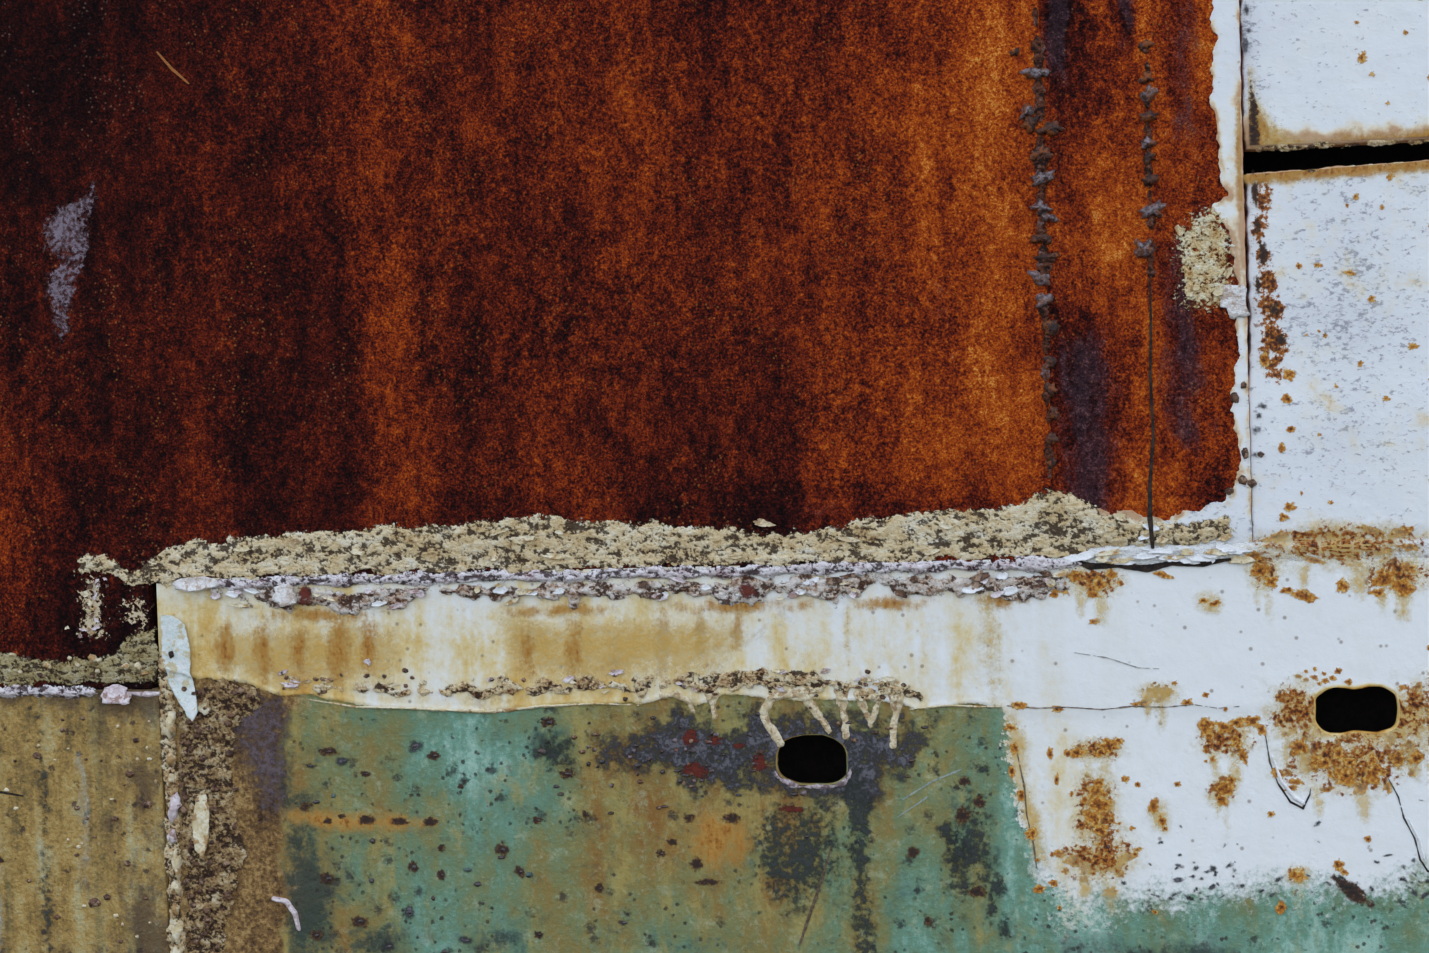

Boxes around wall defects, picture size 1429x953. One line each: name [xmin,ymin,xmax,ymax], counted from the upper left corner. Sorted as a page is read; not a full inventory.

peeling [1172,207,1250,319]
peeling [0,489,1255,721]
corrosion [1049,568,1124,624]
corrosion [1199,597,1221,611]
corrosion [1245,491,1429,615]
corrosion [936,765,1009,936]
corrosion [1004,702,1142,899]
corrosion [1148,797,1168,831]
corrosion [1130,667,1429,816]